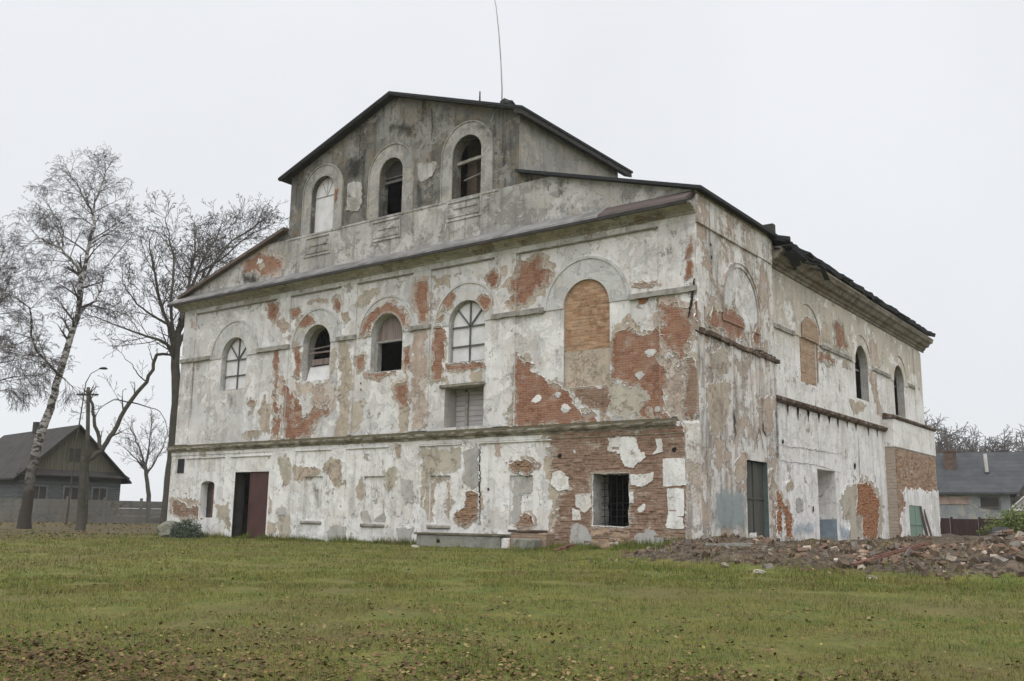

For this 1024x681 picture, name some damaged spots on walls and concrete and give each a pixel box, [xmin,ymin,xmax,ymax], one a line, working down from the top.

flaking render [239,244,286,279]
flaking render [476,251,558,314]
flaking render [241,274,487,501]
flaking render [494,280,762,549]
flaking render [169,493,231,532]
flaking render [417,443,489,529]
spalling [768,468,795,540]
flaking render [838,463,885,540]